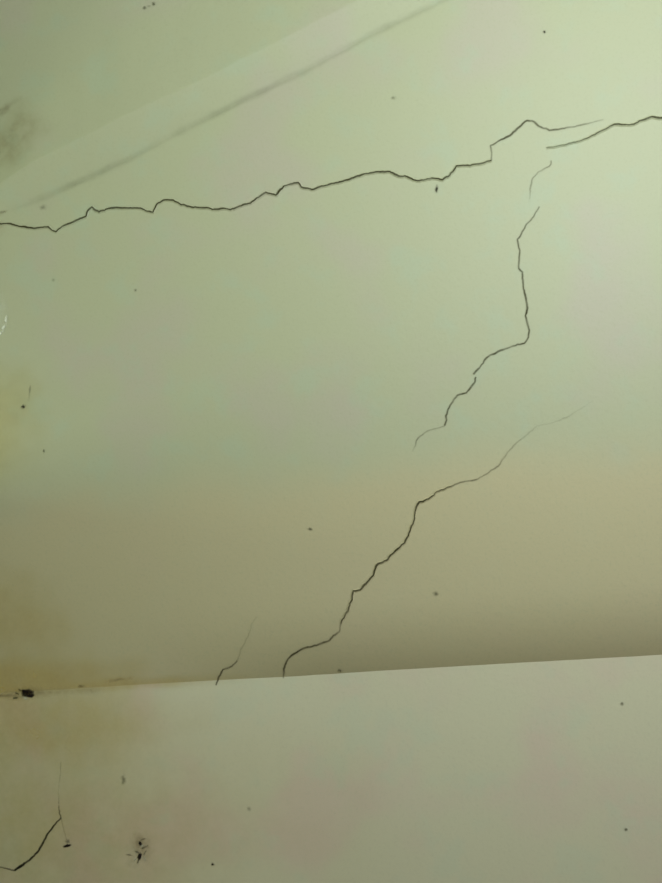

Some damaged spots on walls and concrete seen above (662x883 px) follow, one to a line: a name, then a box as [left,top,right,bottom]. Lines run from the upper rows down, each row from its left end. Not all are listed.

crack [0,115,662,233]
crack [444,227,530,426]
crack [283,485,452,671]
crack [4,817,61,871]